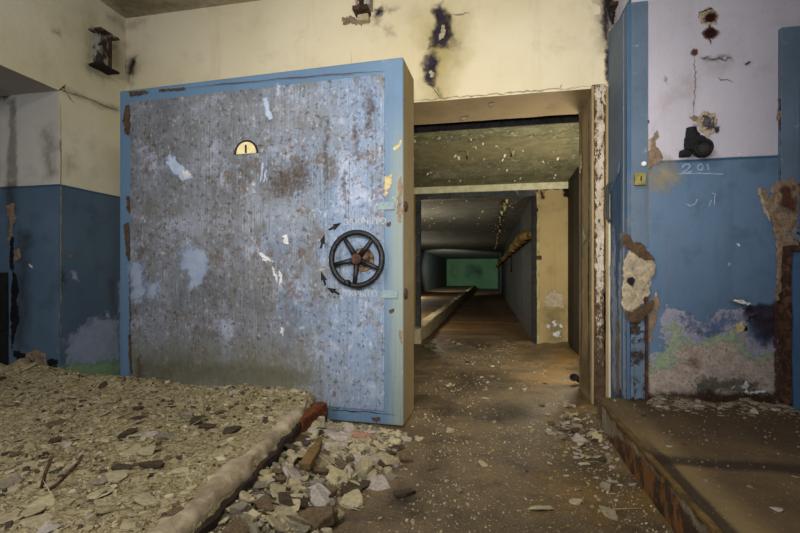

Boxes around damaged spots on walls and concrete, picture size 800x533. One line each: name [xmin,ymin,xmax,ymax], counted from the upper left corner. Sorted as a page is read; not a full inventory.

corrosion [702,12,718,43]
corrosion [159,72,358,91]
leakage [423,54,438,86]
corrosion [122,90,147,135]
spalling [689,111,719,137]
peeling [166,154,193,181]
spalling [648,131,676,186]
corrosion [123,223,131,260]
peeling [610,178,800,420]
peeling [0,203,311,533]